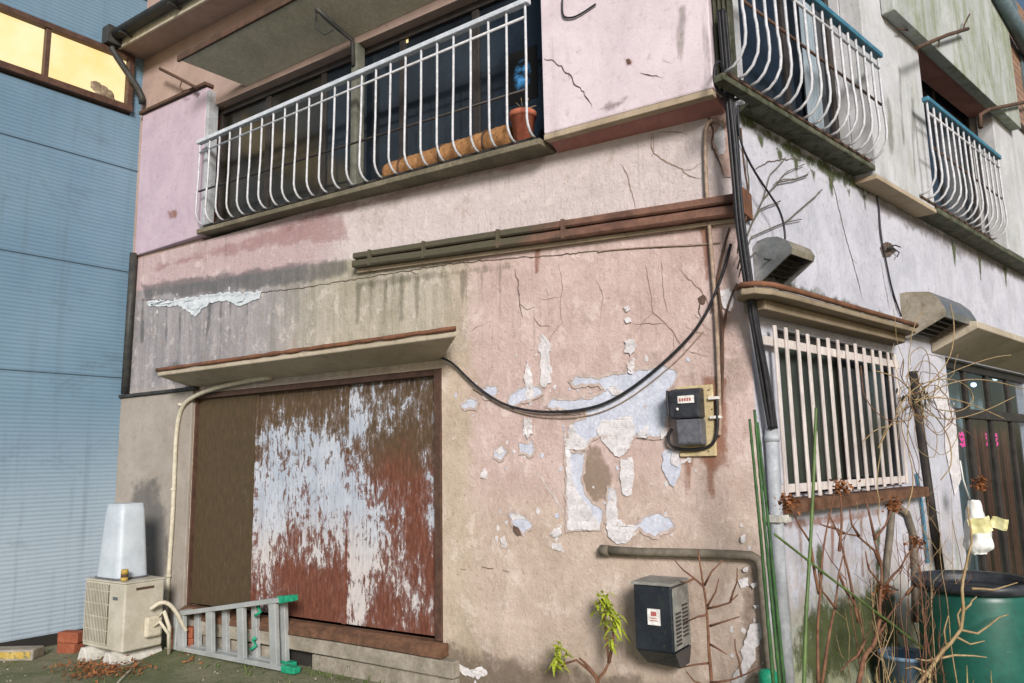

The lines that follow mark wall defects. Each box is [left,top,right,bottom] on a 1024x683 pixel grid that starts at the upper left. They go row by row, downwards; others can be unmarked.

crack [544,58,592,105]
crack [650,131,701,179]
peeling [147,287,261,316]
crack [261,250,597,341]
crack [626,244,711,356]
peeling [454,334,697,553]
peeling [736,567,757,588]
peeling [729,605,764,683]